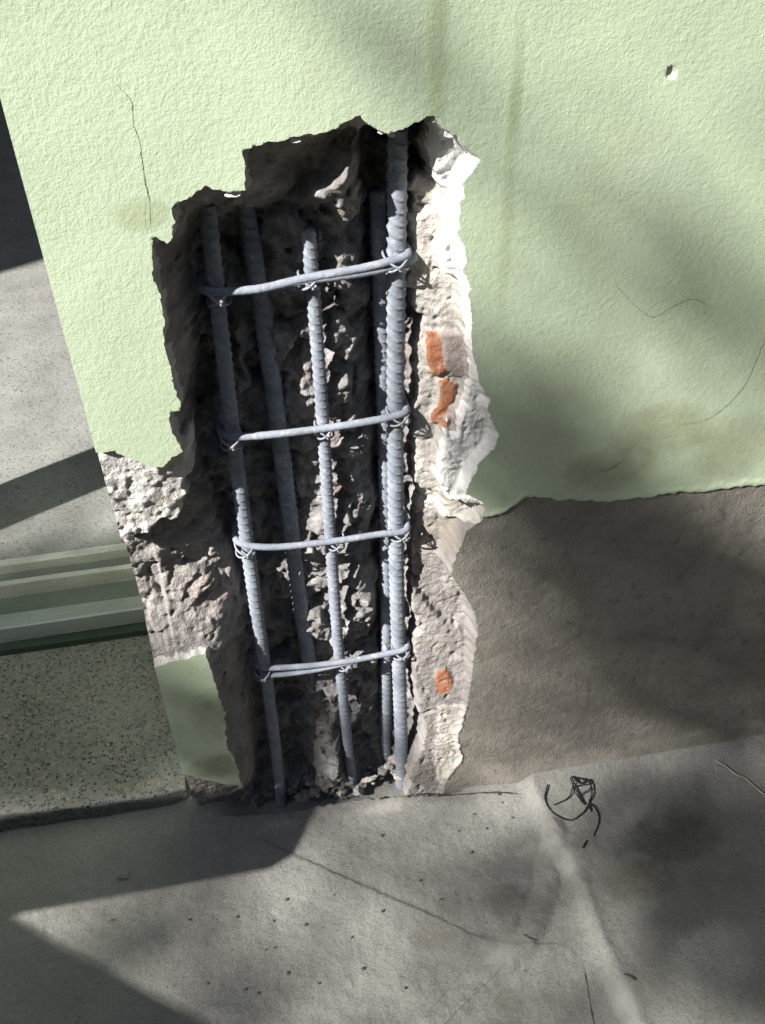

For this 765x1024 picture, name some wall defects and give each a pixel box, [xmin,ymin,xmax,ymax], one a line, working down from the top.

peeling [665,64,678,80]
crack [126,94,151,230]
crack [614,279,709,317]
crack [689,340,765,424]
spalling [98,115,499,808]